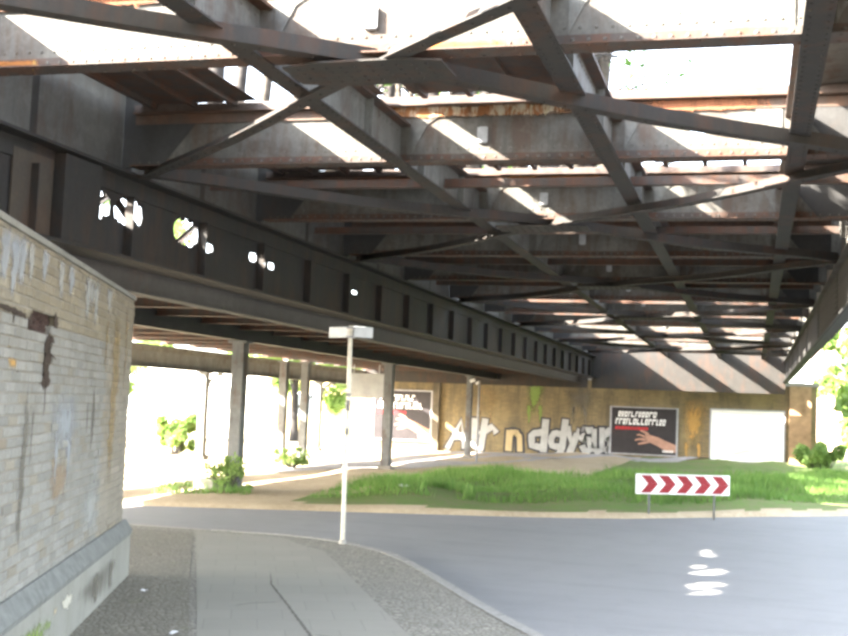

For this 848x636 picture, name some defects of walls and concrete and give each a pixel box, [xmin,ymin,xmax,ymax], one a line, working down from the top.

rust [431,39,500,48]
rust [0,60,36,70]
rust [392,104,571,118]
leakage [1,231,49,291]
leakage [86,281,112,320]